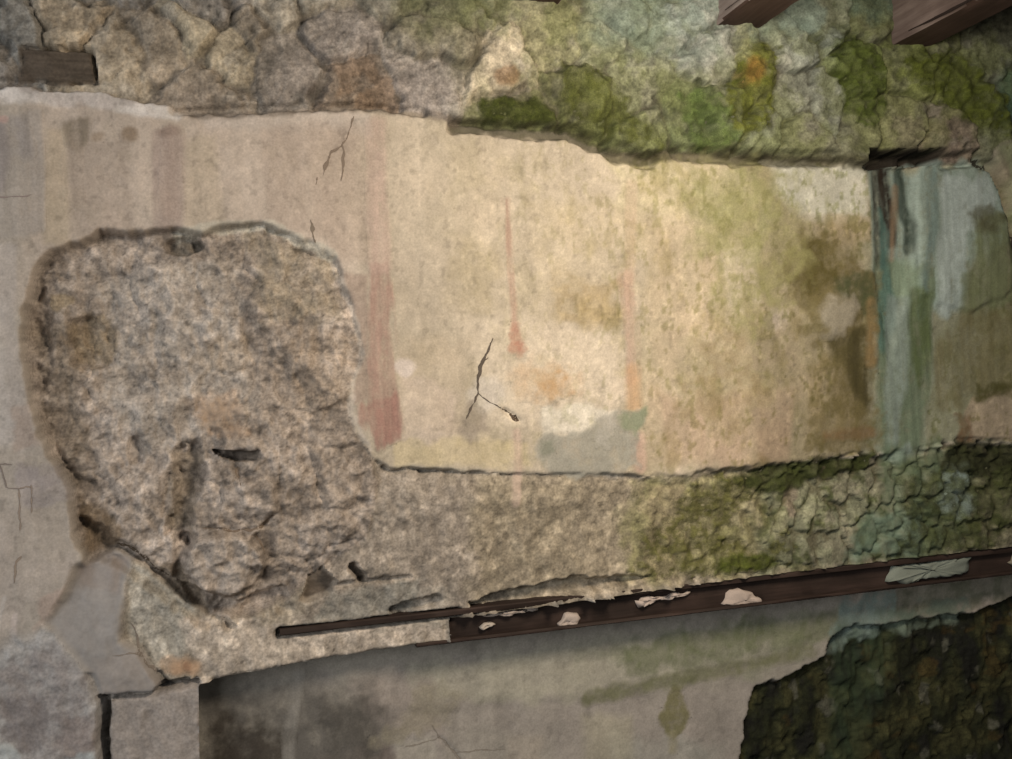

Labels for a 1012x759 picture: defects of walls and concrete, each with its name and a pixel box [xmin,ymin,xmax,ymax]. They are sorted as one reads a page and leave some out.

crack [316,116,354,184]
crack [466,338,503,419]
water stain [819,154,1003,565]
crack [0,463,32,530]
spalling [23,223,880,683]
spalling [982,523,1012,550]
spalling [739,656,831,759]
spalling [865,596,1012,759]